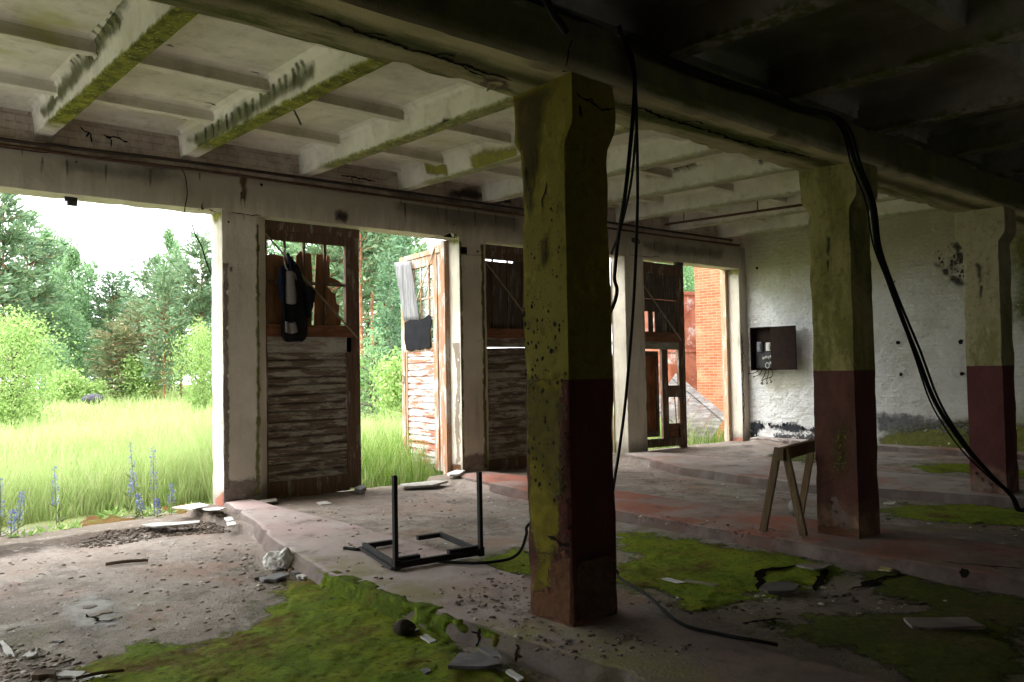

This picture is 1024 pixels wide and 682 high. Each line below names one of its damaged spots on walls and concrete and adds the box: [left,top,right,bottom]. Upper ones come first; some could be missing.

water stain [40,0,124,117]
crack [308,13,512,81]
water stain [194,61,313,147]
crack [562,39,816,159]
water stain [935,243,983,297]
crack [754,565,829,591]
crack [852,574,908,589]